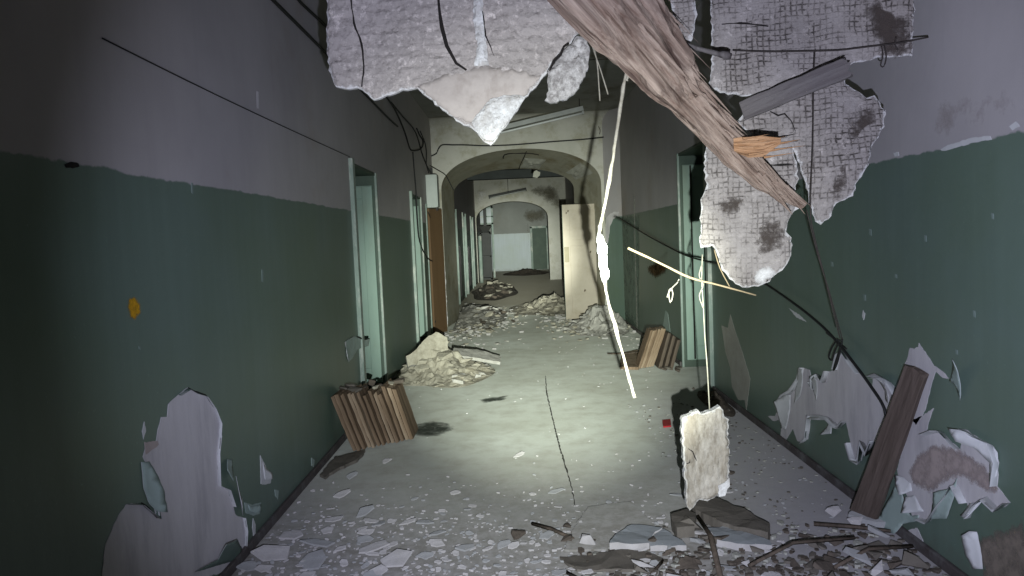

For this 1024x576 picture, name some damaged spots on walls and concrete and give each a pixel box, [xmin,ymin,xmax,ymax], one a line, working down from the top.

flaking render [521,158,546,178]
peeling [459,246,471,296]
peeling [102,387,261,576]
peeling [260,456,279,499]
crack [545,376,575,505]
peeling [768,351,895,465]
peeling [879,344,1024,576]